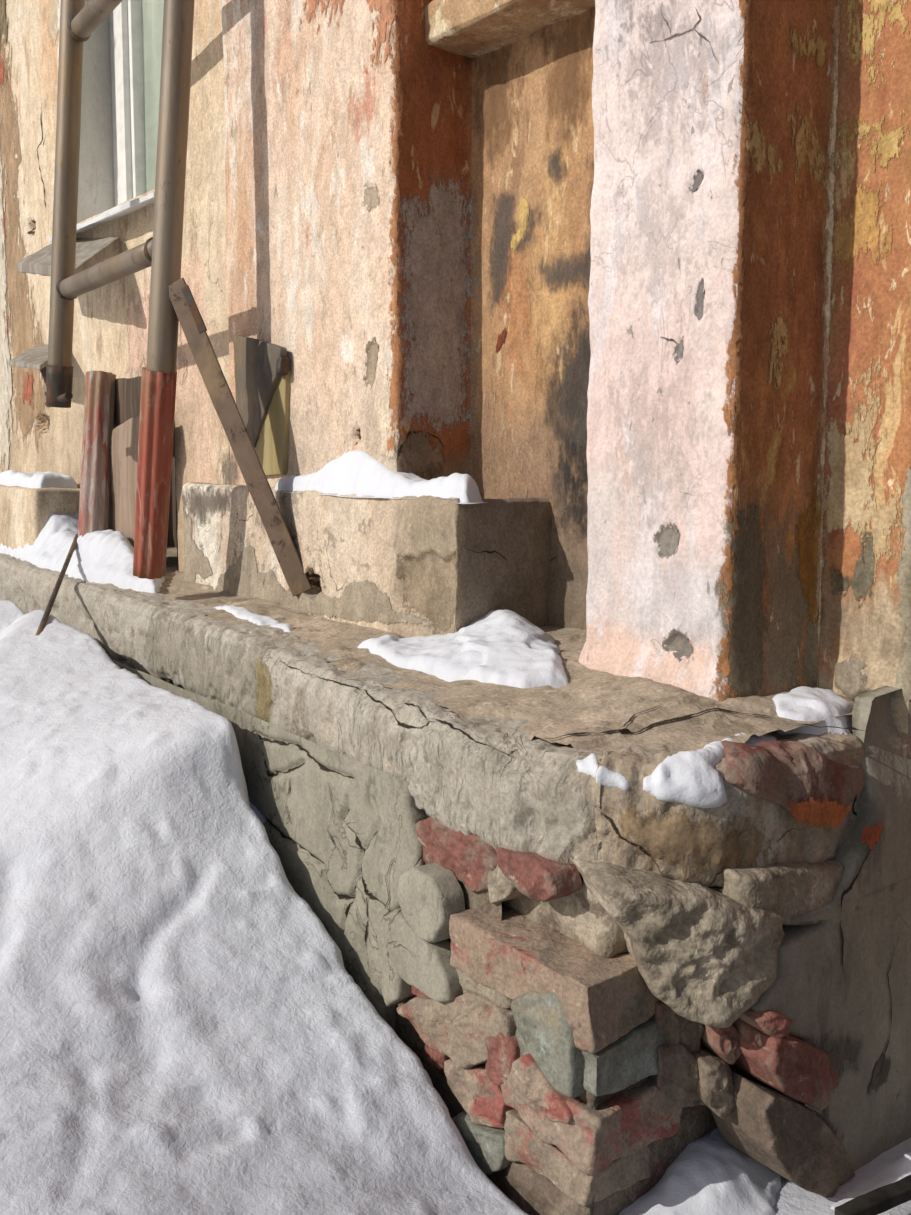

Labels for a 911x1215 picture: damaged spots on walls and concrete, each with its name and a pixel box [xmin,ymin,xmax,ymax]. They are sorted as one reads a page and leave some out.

peeling [299,0,344,32]
crack [650,7,718,62]
peeling [361,0,479,460]
peeling [709,0,911,701]
water stain [547,309,591,536]
peeling [183,508,460,635]
crack [279,660,518,779]
crack [548,705,864,739]
crack [256,733,391,971]